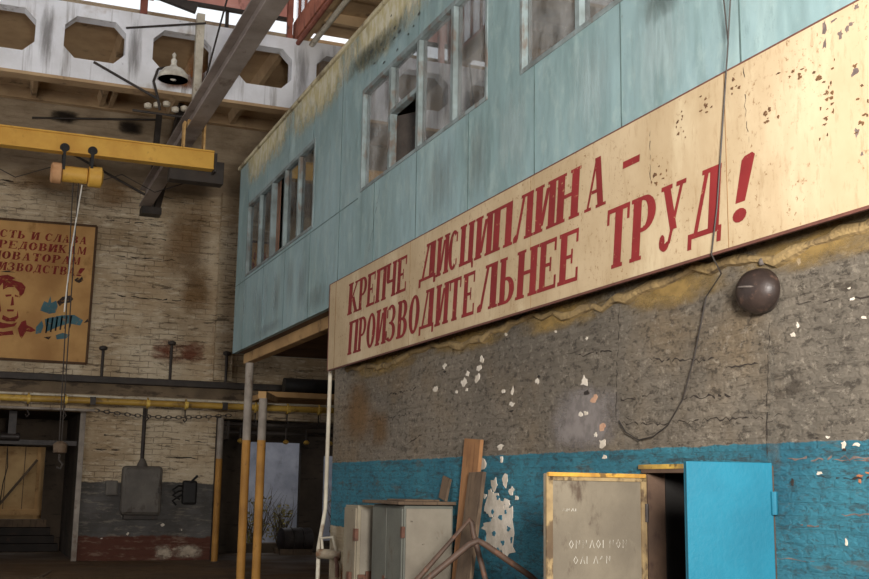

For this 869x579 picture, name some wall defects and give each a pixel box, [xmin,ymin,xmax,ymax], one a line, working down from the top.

leakage [248,0,420,182]
peeling [455,355,484,394]
spalling [578,375,598,417]
spalling [594,423,607,459]
peeling [482,473,519,556]